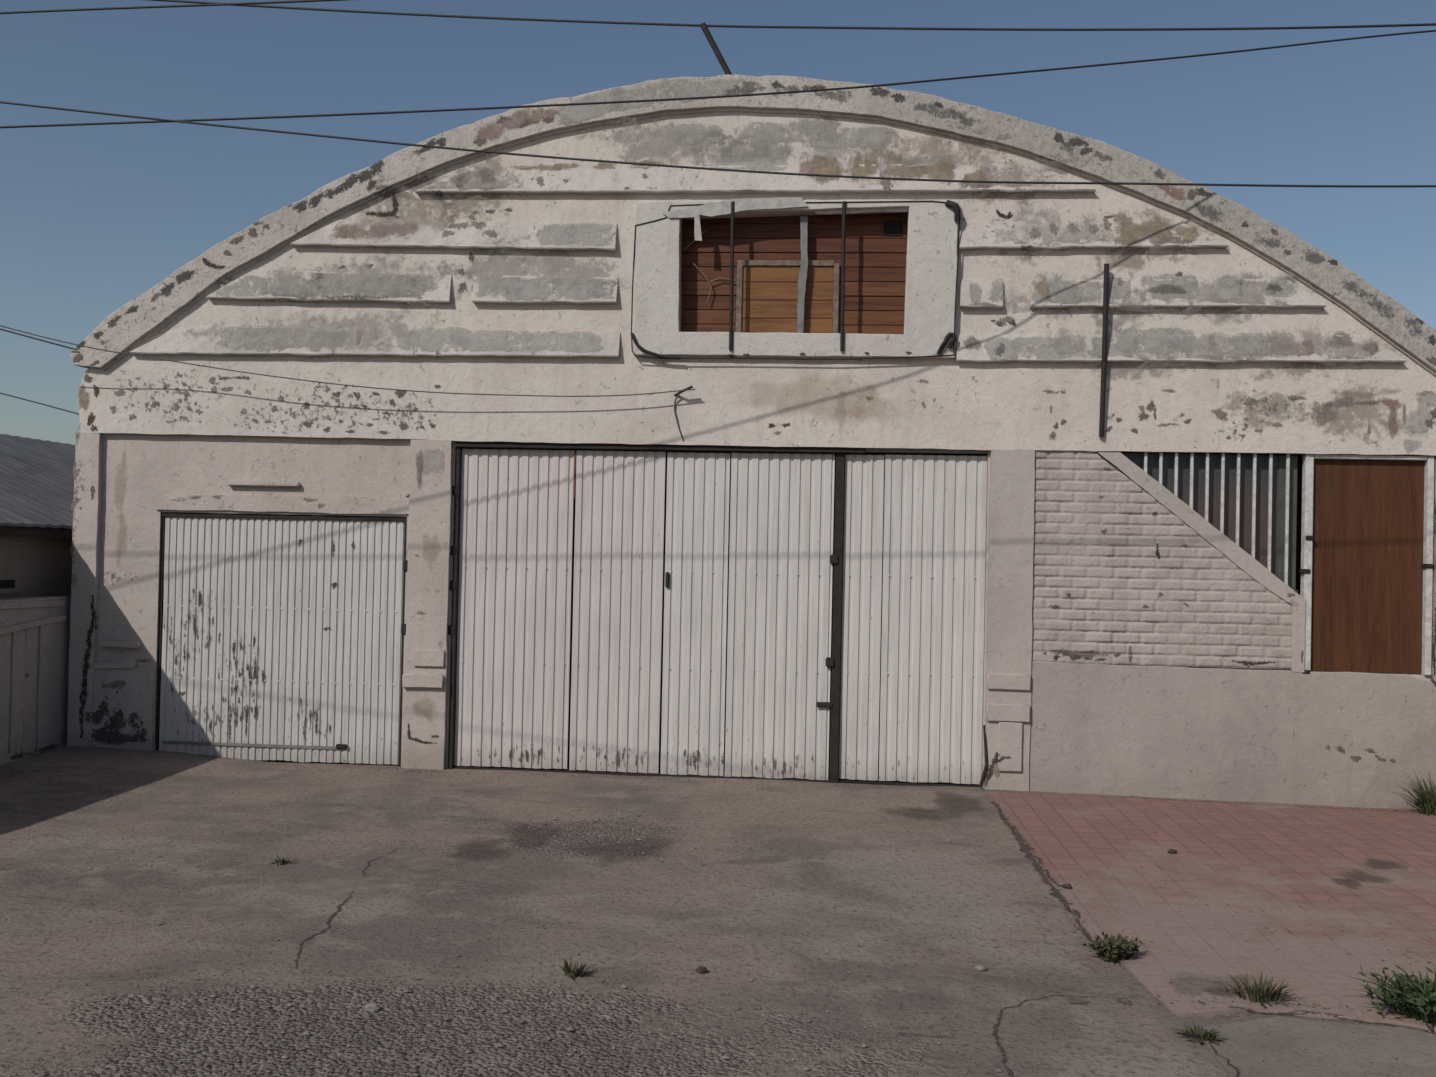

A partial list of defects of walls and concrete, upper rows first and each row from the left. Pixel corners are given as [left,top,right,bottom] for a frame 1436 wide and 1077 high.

peeling [473,78,739,146]
peeling [510,163,577,186]
peeling [1154,168,1222,219]
peeling [333,222,417,238]
peeling [442,208,512,238]
peeling [1030,271,1199,303]
peeling [965,279,1297,361]
peeling [109,363,440,435]
peeling [1105,389,1191,433]
peeling [1212,390,1306,441]
damp [85,700,150,746]
corrosion [228,704,257,742]